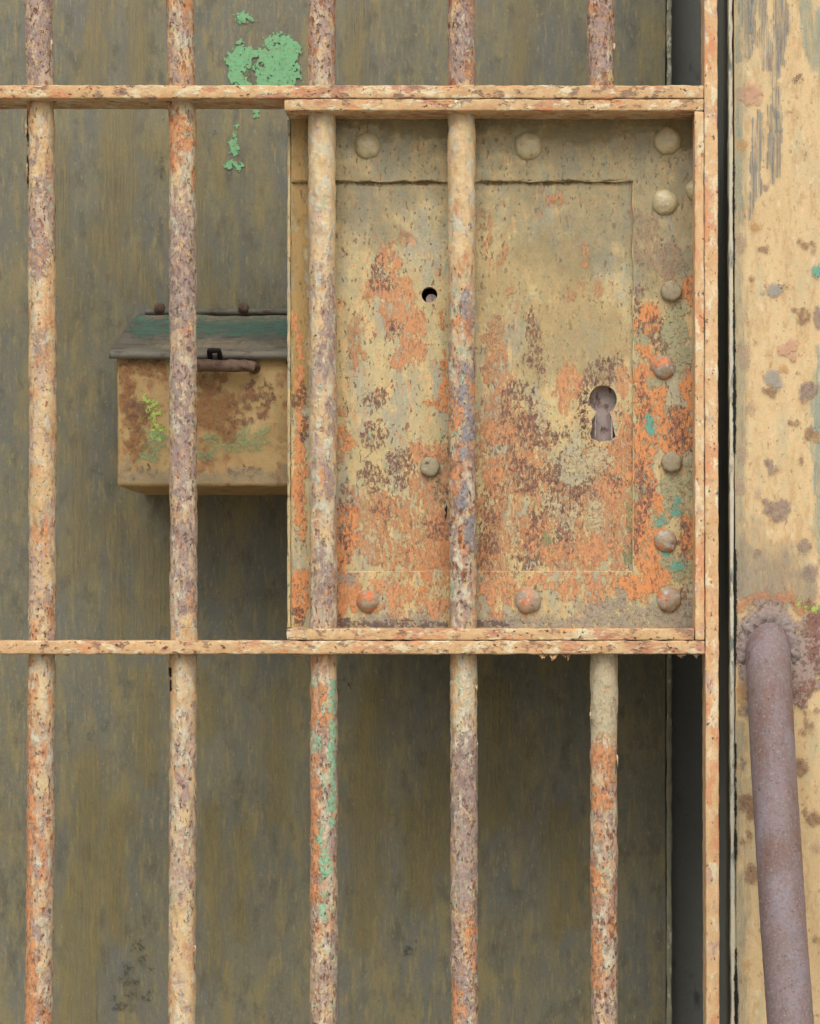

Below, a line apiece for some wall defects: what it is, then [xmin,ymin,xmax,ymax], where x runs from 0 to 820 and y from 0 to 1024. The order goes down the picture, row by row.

peeling [232,10,257,23]
peeling [223,31,304,86]
peeling [223,124,245,172]
rust [292,119,693,627]
rust [119,341,277,628]
rust [736,587,820,735]